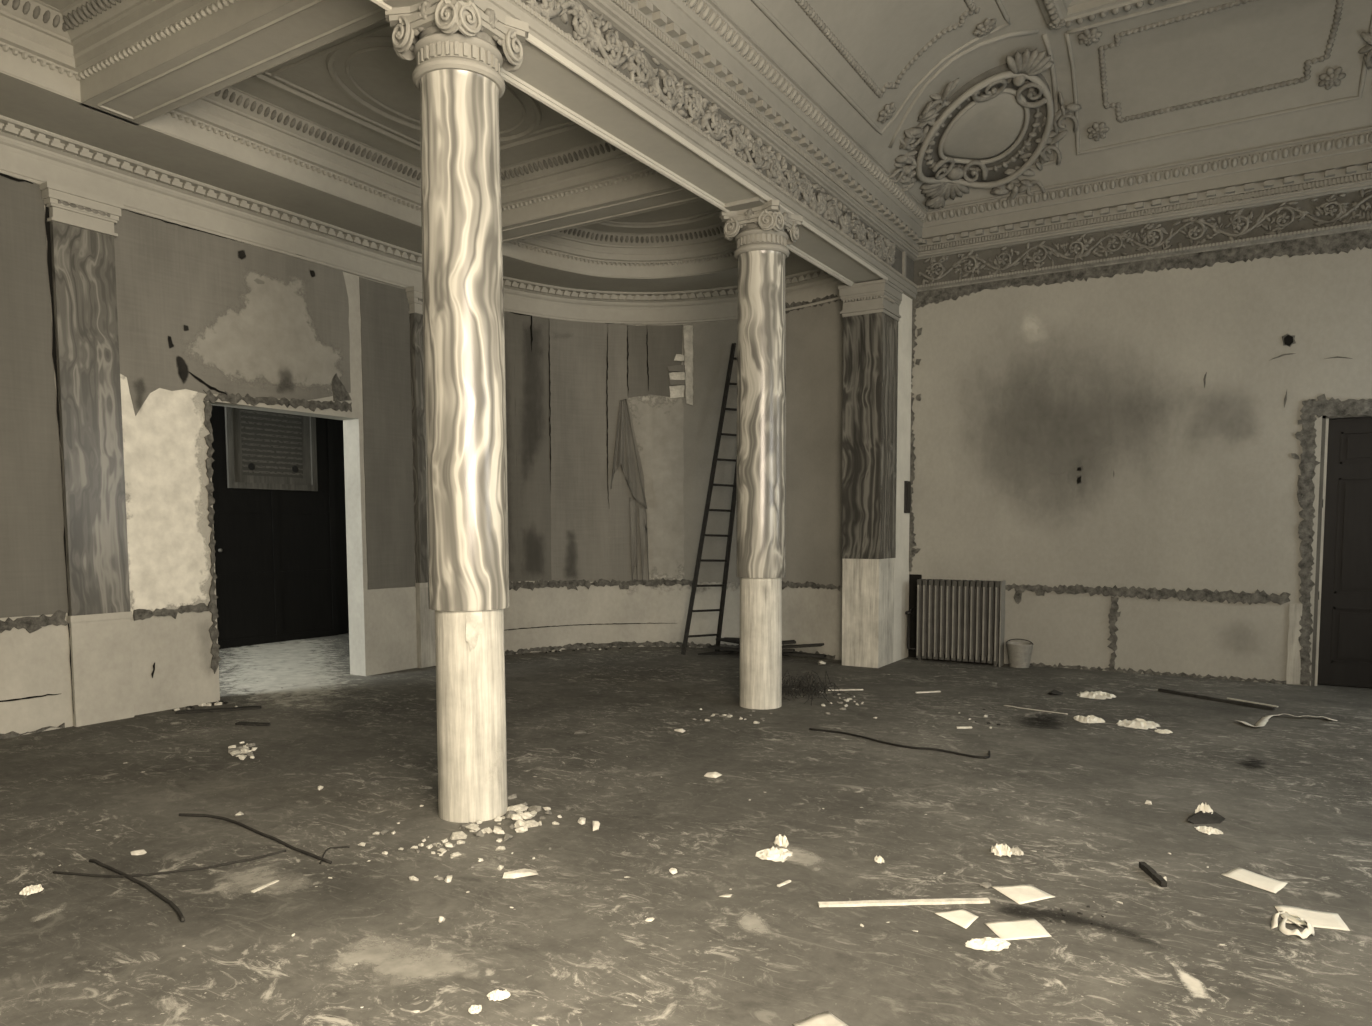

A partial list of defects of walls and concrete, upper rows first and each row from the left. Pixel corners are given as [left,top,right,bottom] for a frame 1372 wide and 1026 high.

spalling [0,610,69,633]
crack [0,173,74,715]
flaking render [120,271,352,674]
peeling [509,394,710,591]
spalling [782,581,840,591]
spalling [909,219,1372,571]
spalling [1005,394,1372,686]